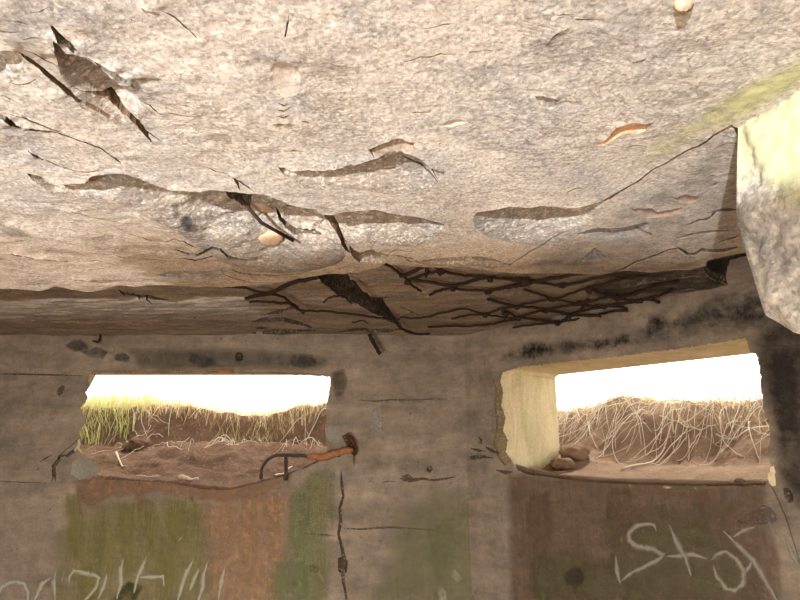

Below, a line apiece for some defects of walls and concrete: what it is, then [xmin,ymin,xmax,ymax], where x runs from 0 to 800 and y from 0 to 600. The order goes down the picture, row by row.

crack [0,8,198,173]
spalling [597,123,651,145]
spalling [278,138,447,194]
crack [603,125,737,202]
peeling [0,173,744,355]
crack [514,230,567,262]
crack [617,208,739,291]
crack [4,370,80,378]
crack [0,447,76,483]
rust [347,432,358,460]
crack [306,471,455,600]
water stain [118,583,139,599]